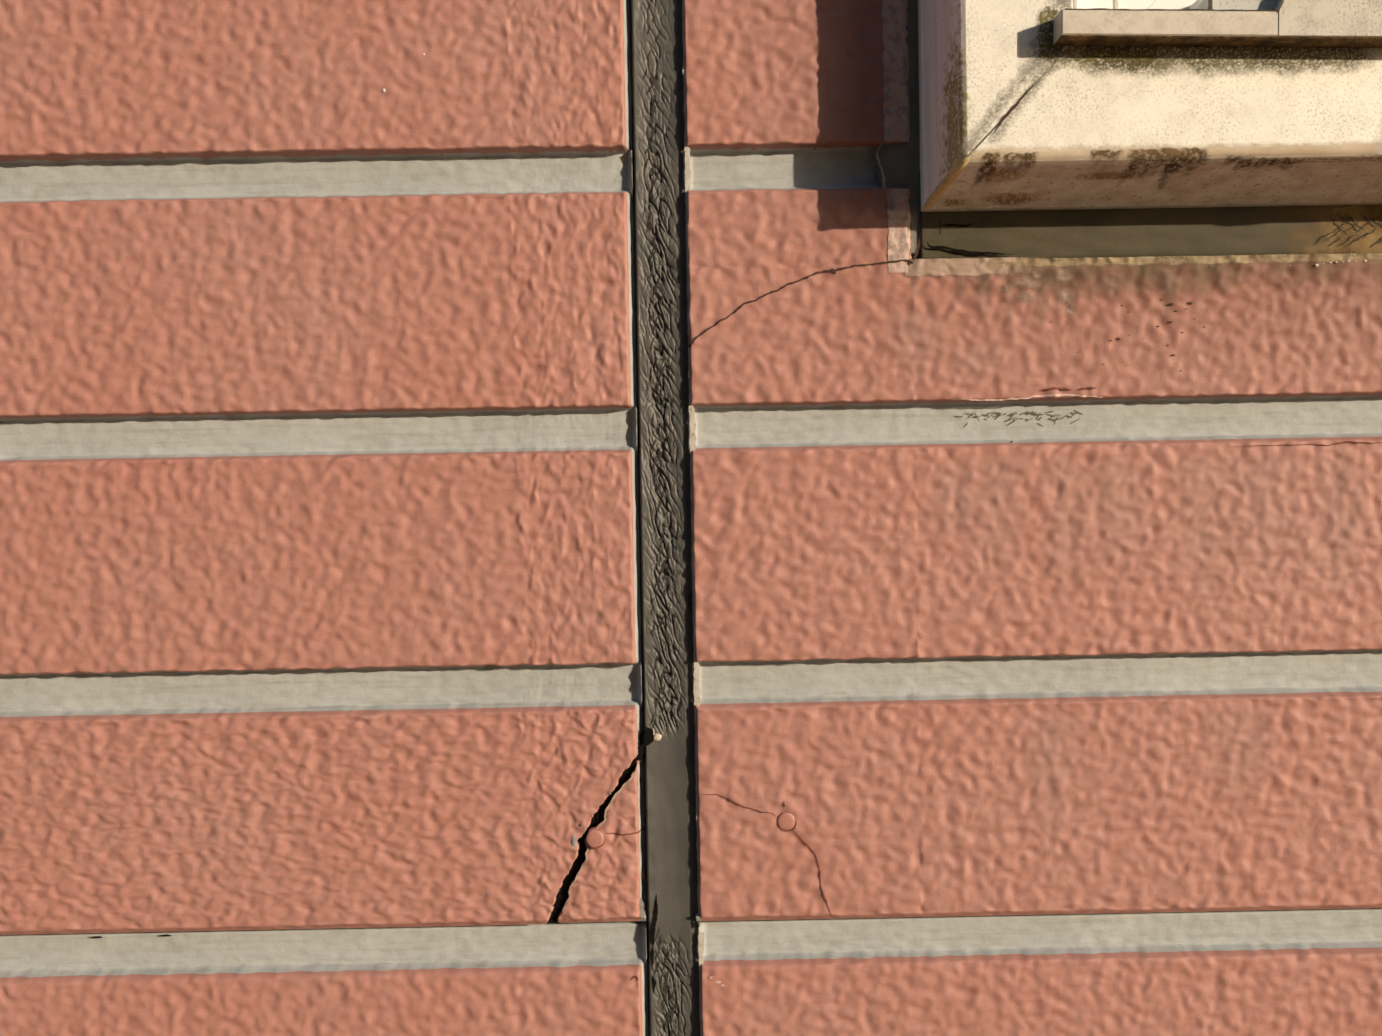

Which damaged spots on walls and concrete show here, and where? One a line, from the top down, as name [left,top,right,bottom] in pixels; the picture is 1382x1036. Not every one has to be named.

damp [1032,0,1373,74]
damp [1091,148,1206,179]
damp [1228,157,1294,167]
crack [547,0,1013,923]